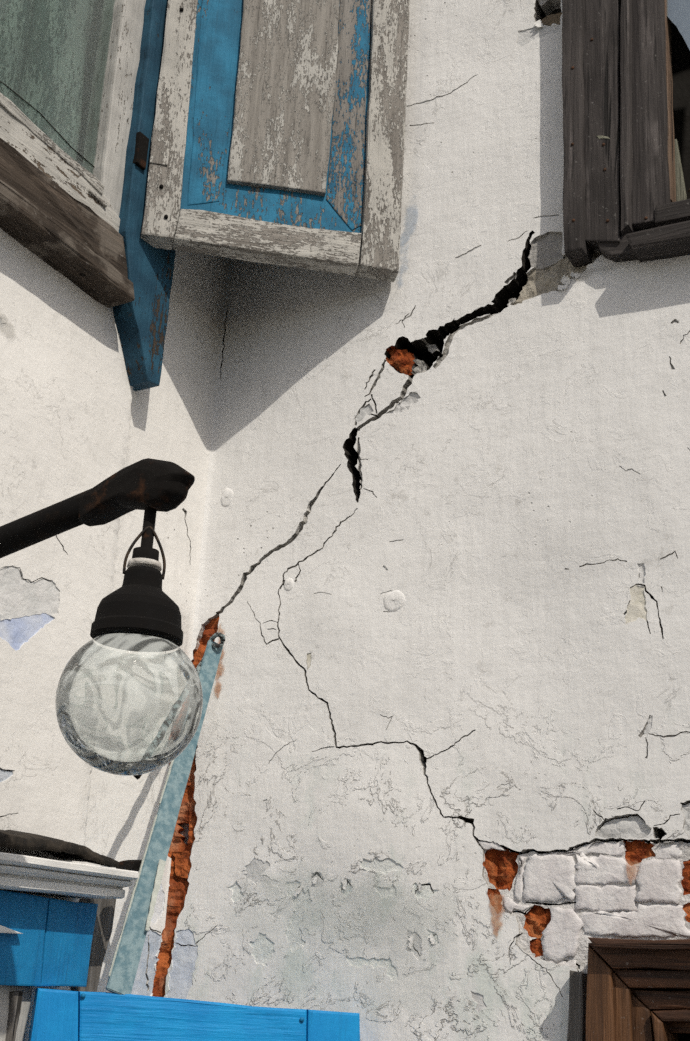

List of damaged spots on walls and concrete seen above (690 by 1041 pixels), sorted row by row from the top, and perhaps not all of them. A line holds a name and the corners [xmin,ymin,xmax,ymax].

spalling [510,231,602,305]
crack [662,319,690,397]
crack [182,508,191,560]
crack [191,215,559,850]
peeling [0,565,60,651]
crack [565,551,678,639]
peeling [624,563,647,624]
peeling [0,767,15,782]
crack [638,715,690,758]
crack [145,694,217,997]
peeling [131,859,198,999]
spalling [478,800,690,997]